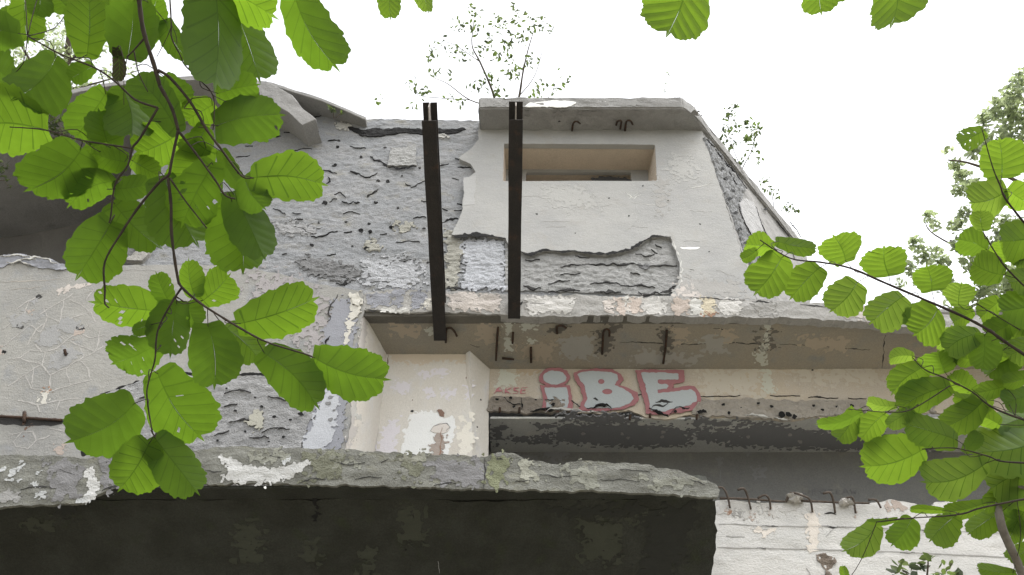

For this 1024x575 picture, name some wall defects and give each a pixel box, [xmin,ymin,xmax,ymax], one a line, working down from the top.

peeling [376,146,421,183]
spalling [463,176,476,206]
spalling [703,137,768,250]
spalling [0,253,67,271]
spalling [443,228,464,291]
spalling [521,238,683,296]
crack [4,288,145,449]
crack [214,372,287,458]